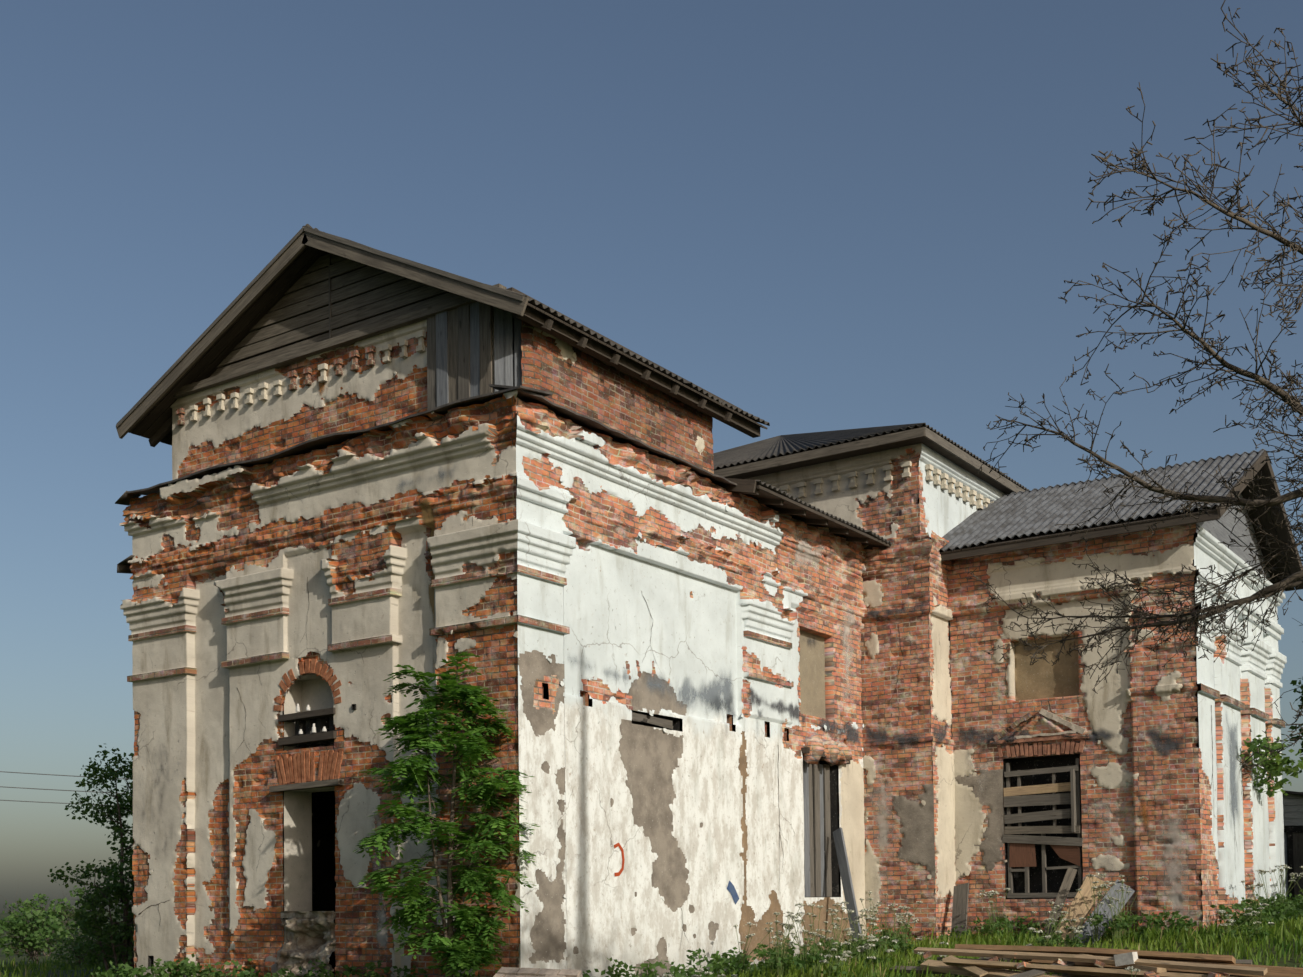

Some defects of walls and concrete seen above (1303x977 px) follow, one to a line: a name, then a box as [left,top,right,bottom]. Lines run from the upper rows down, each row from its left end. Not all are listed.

flaking render [120,327,929,977]
flaking render [986,544,1196,789]
water stain [876,785,888,850]
flaking render [892,744,1007,898]